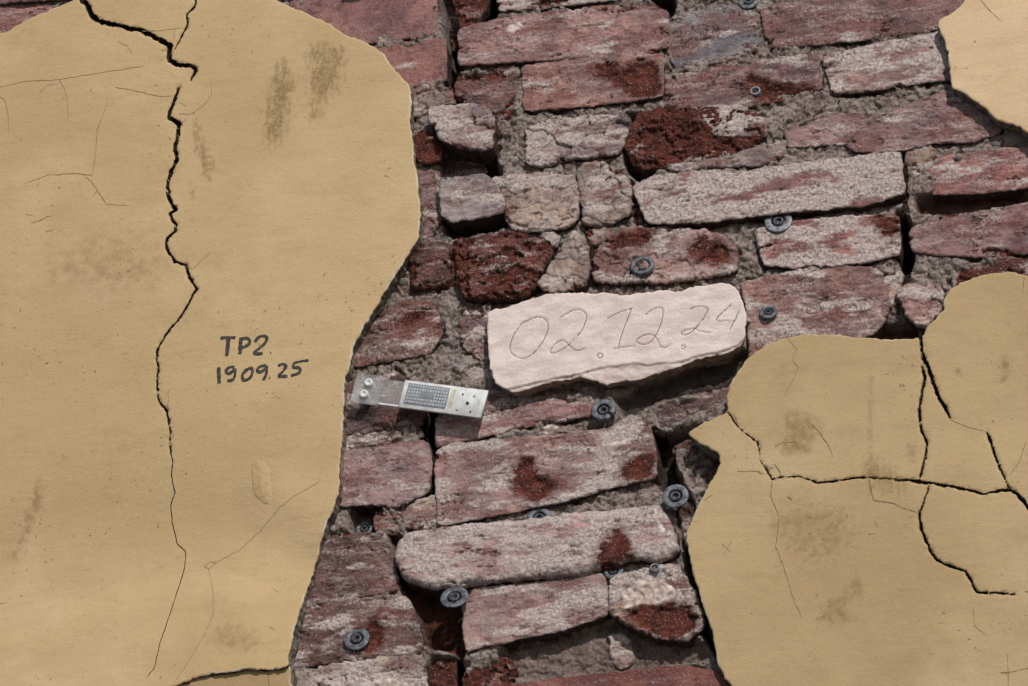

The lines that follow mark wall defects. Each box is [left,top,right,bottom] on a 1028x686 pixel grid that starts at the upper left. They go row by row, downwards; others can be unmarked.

peeling [651,0,672,10]
crack [1,0,323,686]
crack [727,330,1028,634]